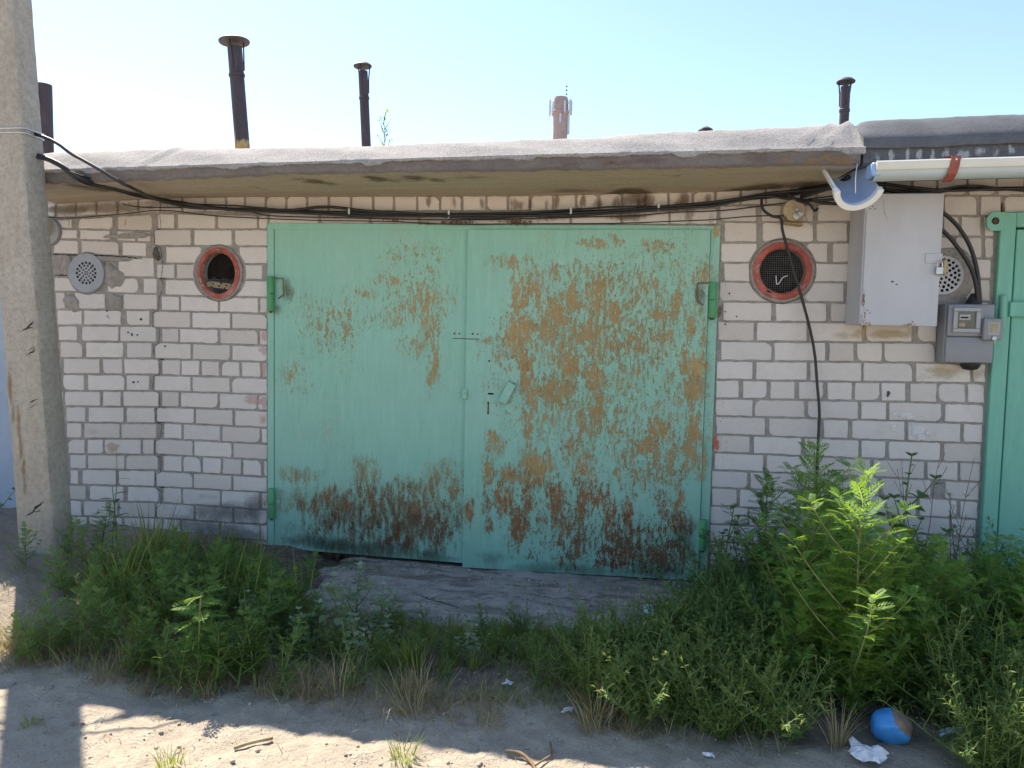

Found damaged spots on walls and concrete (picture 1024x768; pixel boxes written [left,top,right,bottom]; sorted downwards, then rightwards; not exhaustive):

corrosion [275,219,727,576]